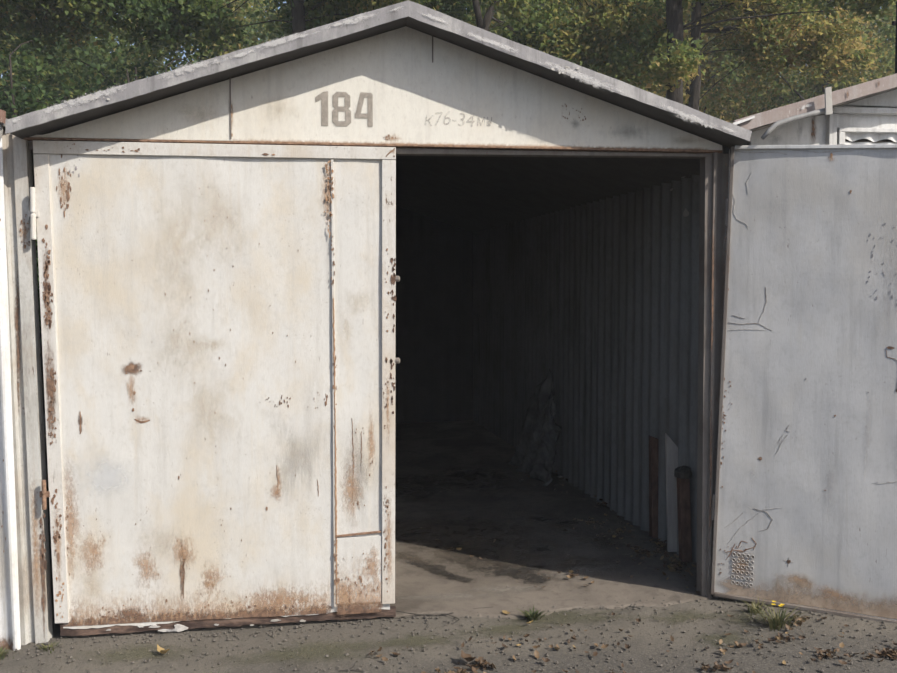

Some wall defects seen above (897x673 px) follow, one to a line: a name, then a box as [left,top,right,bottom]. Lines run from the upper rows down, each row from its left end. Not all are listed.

corrosion [324,160,335,285]
crack [733,150,838,228]
crack [728,287,772,331]
corrosion [39,298,390,631]
crack [720,507,782,574]
corrosion [722,575,897,619]